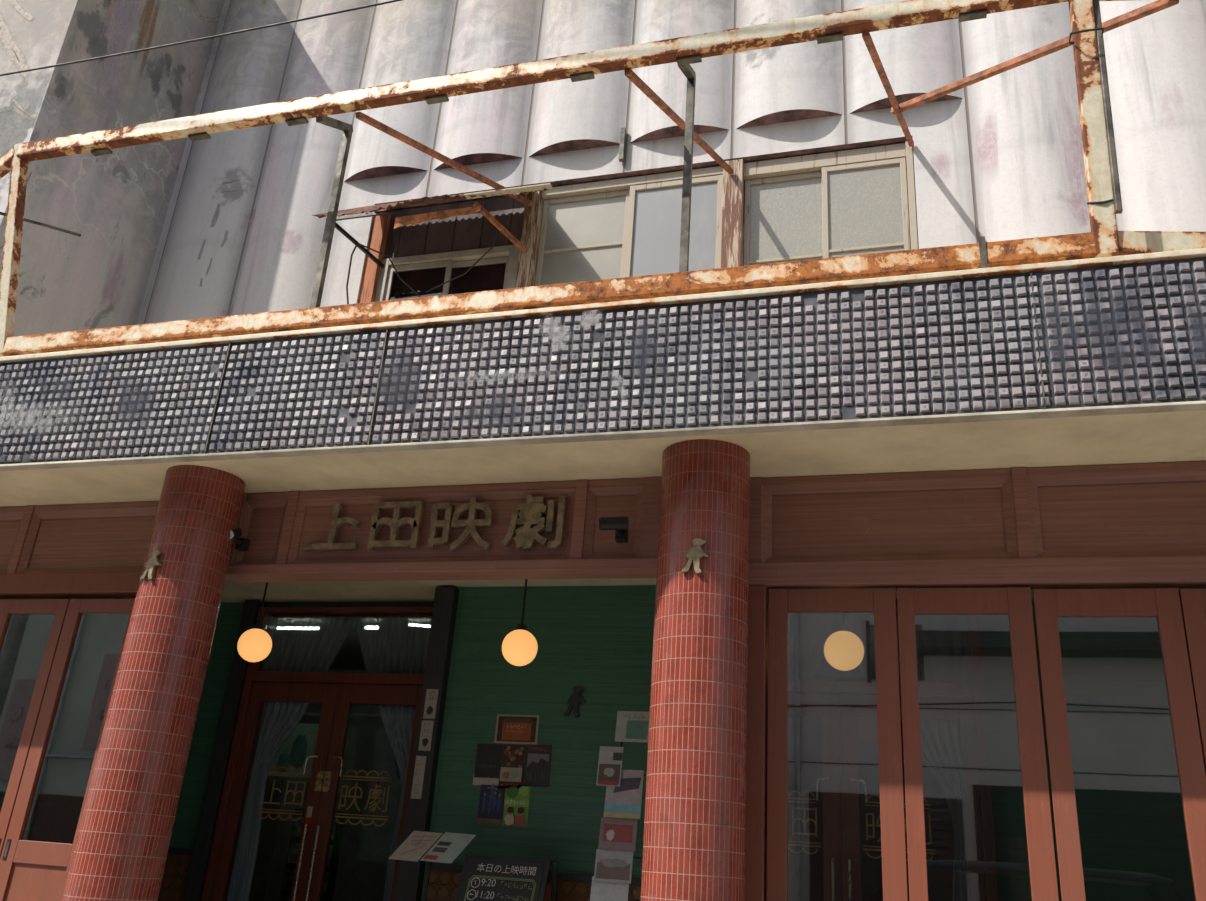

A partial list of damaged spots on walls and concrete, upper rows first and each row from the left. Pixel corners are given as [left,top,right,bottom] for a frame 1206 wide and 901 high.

crack [0,0,37,121]